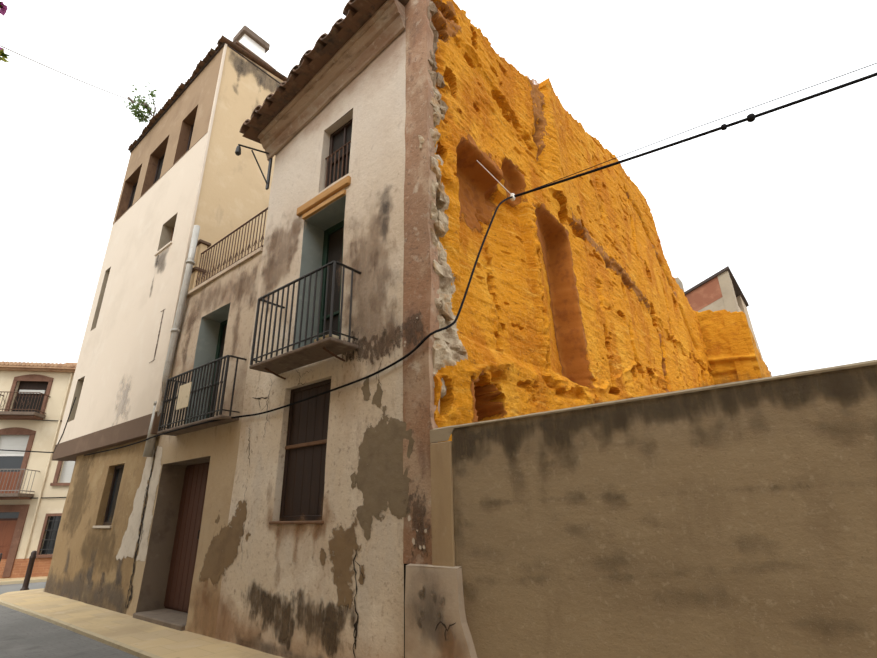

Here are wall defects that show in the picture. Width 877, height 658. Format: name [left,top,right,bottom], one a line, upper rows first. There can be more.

peeling [314,312,423,364]
water stain [454,370,877,459]
peeling [320,378,430,609]
water stain [47,531,123,612]
peeling [199,501,251,585]
water stain [238,582,355,655]
crack [346,550,364,656]